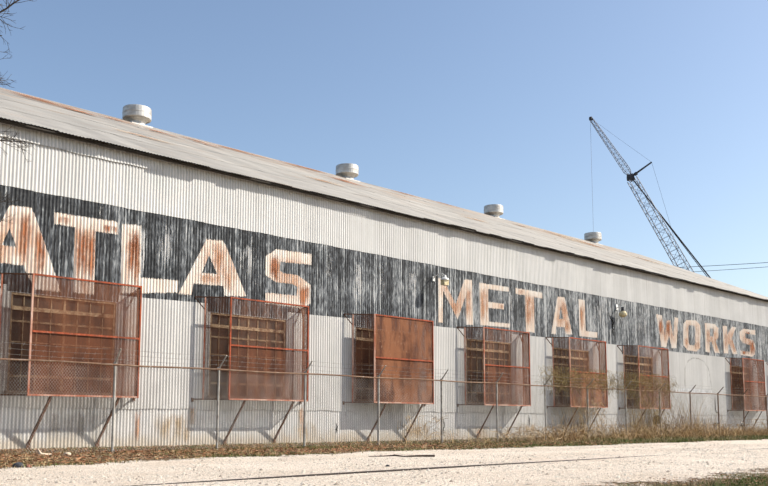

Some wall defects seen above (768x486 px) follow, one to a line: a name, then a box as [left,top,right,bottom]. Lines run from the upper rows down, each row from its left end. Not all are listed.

rust [0,219,45,270]
rust [75,235,95,275]
rust [130,234,139,279]
peeling [240,240,256,275]
rust [271,259,309,305]